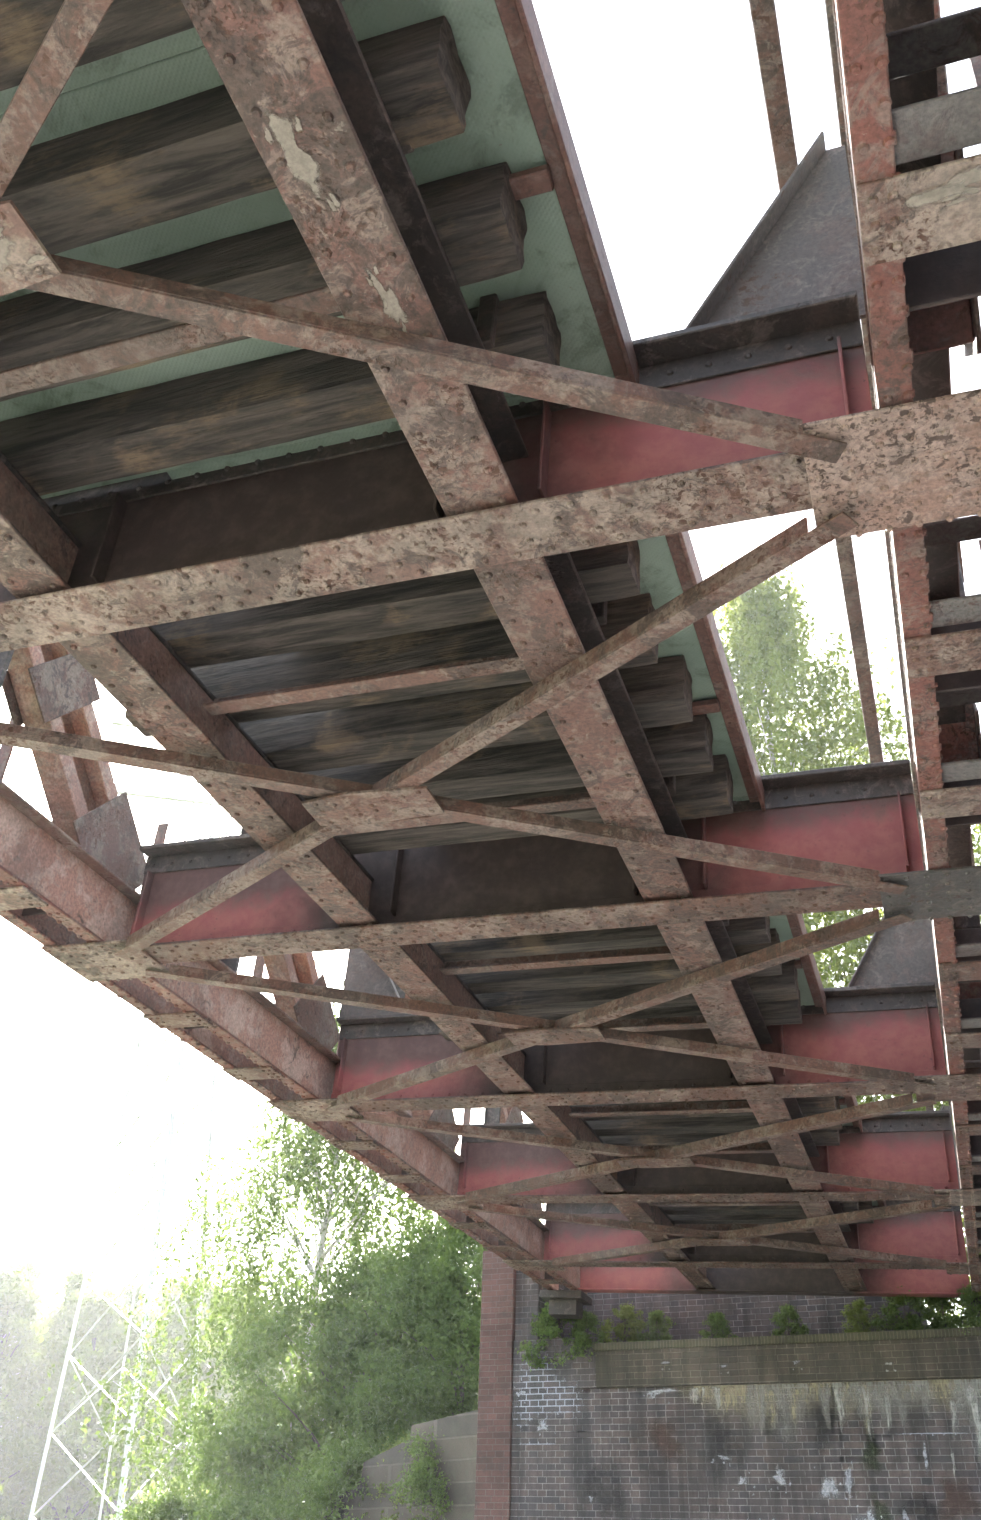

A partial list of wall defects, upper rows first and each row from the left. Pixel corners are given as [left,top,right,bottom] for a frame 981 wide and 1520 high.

peeling [264,114,341,212]
water stain [647,1378,981,1467]
water stain [711,1456,791,1495]
water stain [814,1461,882,1520]